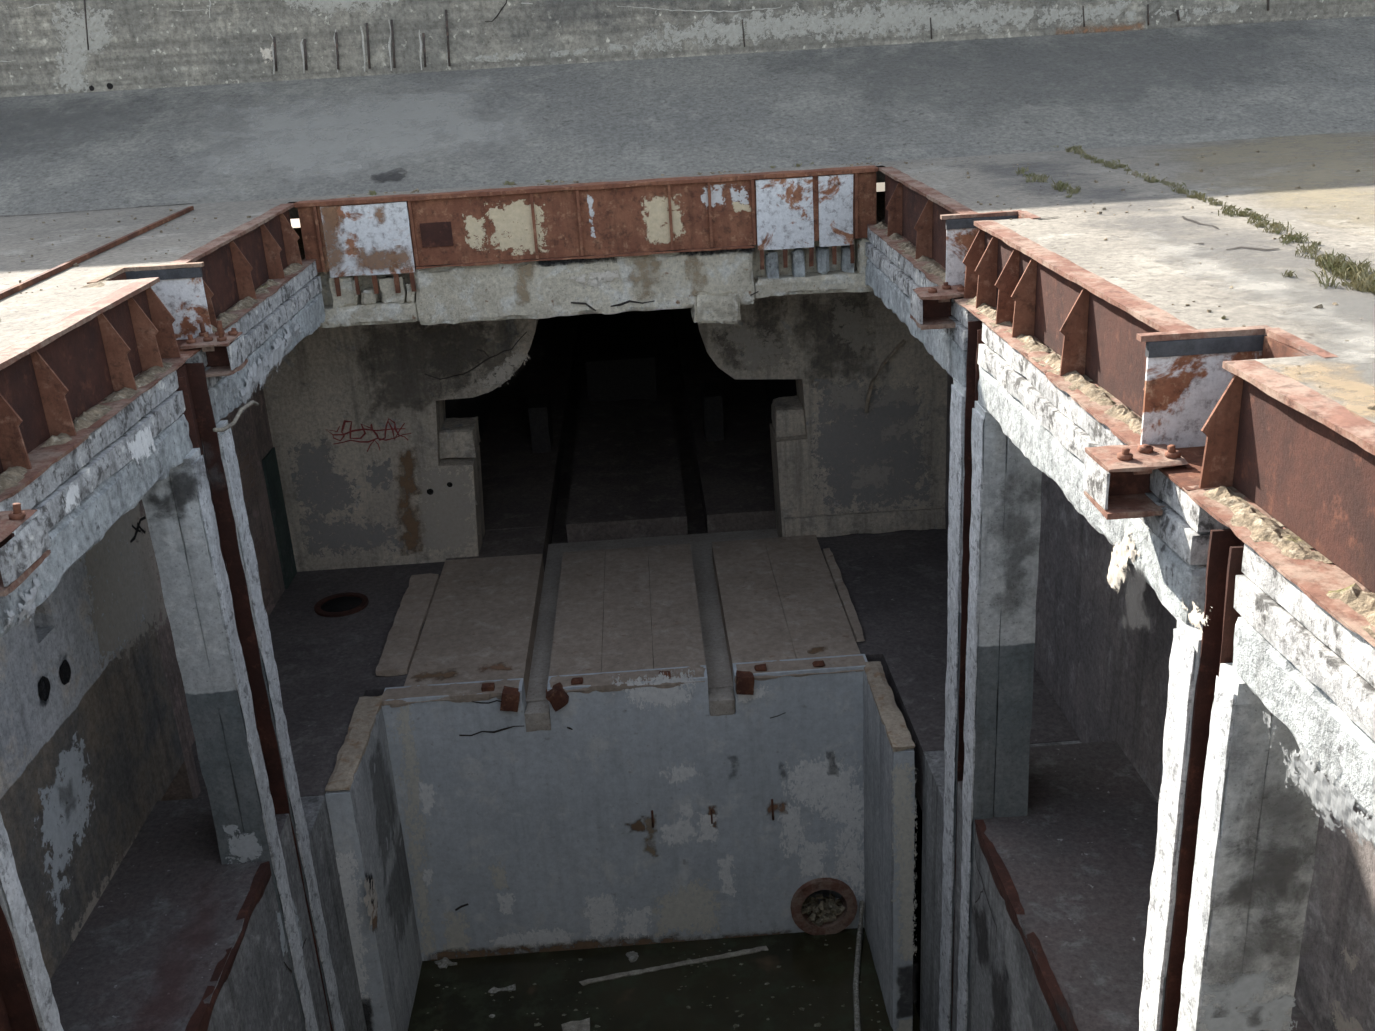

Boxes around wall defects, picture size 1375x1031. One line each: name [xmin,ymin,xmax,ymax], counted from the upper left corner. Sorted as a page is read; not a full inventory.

crack [485,0,533,22]
rust [321,207,411,273]
rust [1283,364,1375,416]
spalling [0,191,1230,1031]
rust [626,810,658,856]
rust [767,799,788,820]
spalling [1177,543,1375,1031]